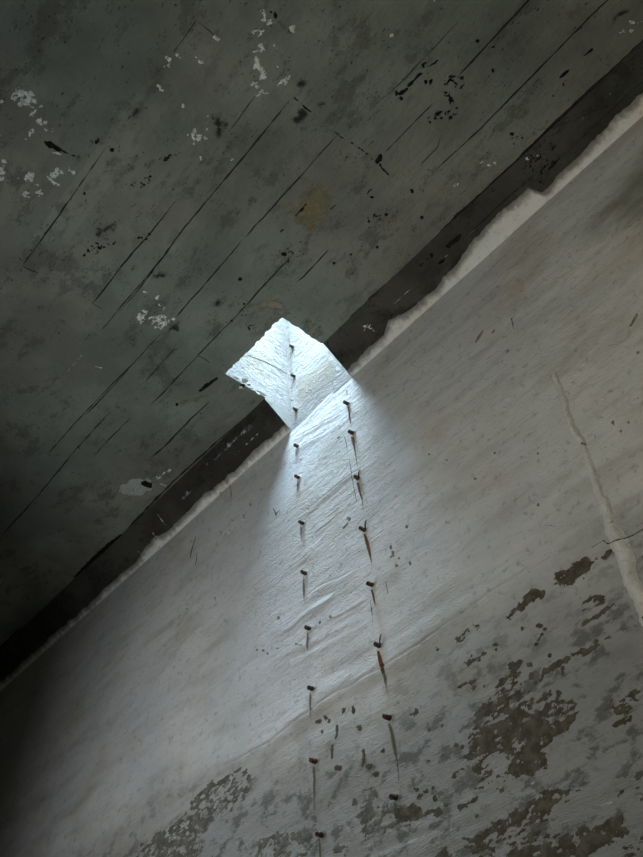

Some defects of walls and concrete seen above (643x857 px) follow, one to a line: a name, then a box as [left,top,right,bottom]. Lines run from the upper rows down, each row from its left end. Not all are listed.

crack [593,521,643,547]
peeling [553,549,614,586]
peeling [506,588,545,620]
peeling [580,595,616,626]
rust [377,651,387,686]
peeling [604,689,642,728]
peeling [315,715,342,771]
peeling [352,635,612,837]
peeling [462,785,643,857]